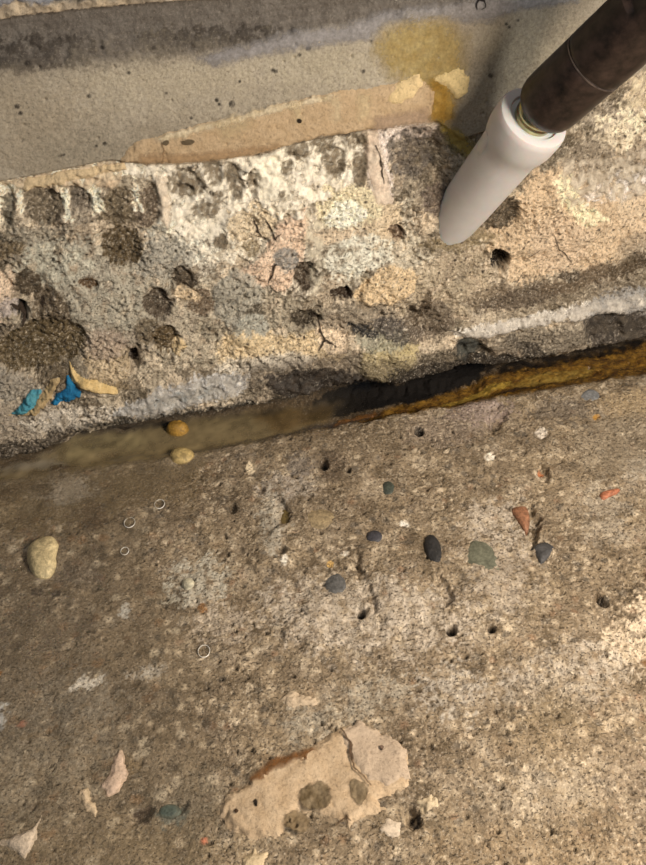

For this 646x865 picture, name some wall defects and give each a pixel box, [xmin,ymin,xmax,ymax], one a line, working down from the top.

spalling [0,67,646,459]
corrosion [325,341,646,429]
peeling [219,720,411,840]